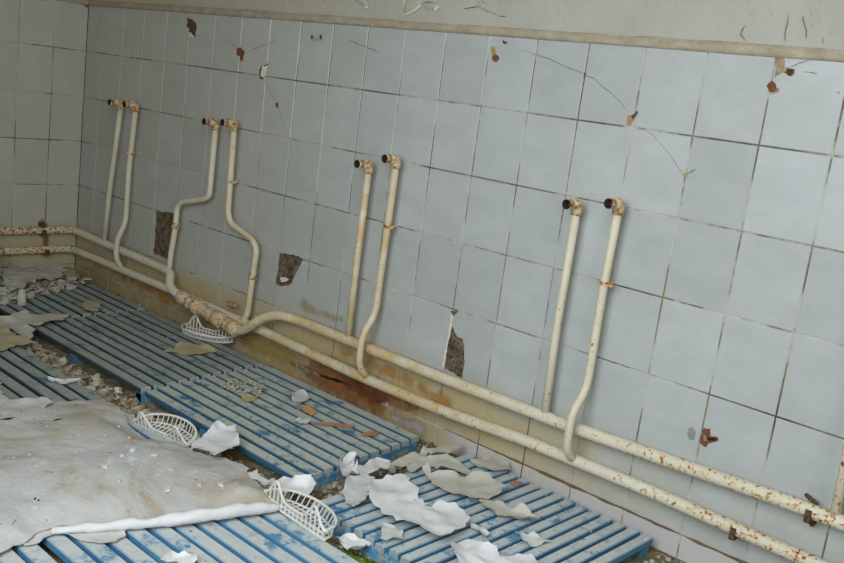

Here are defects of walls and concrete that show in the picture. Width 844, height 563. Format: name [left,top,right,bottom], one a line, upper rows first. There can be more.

spalling [153,210,174,259]
spalling [276,253,304,286]
spalling [442,311,465,378]